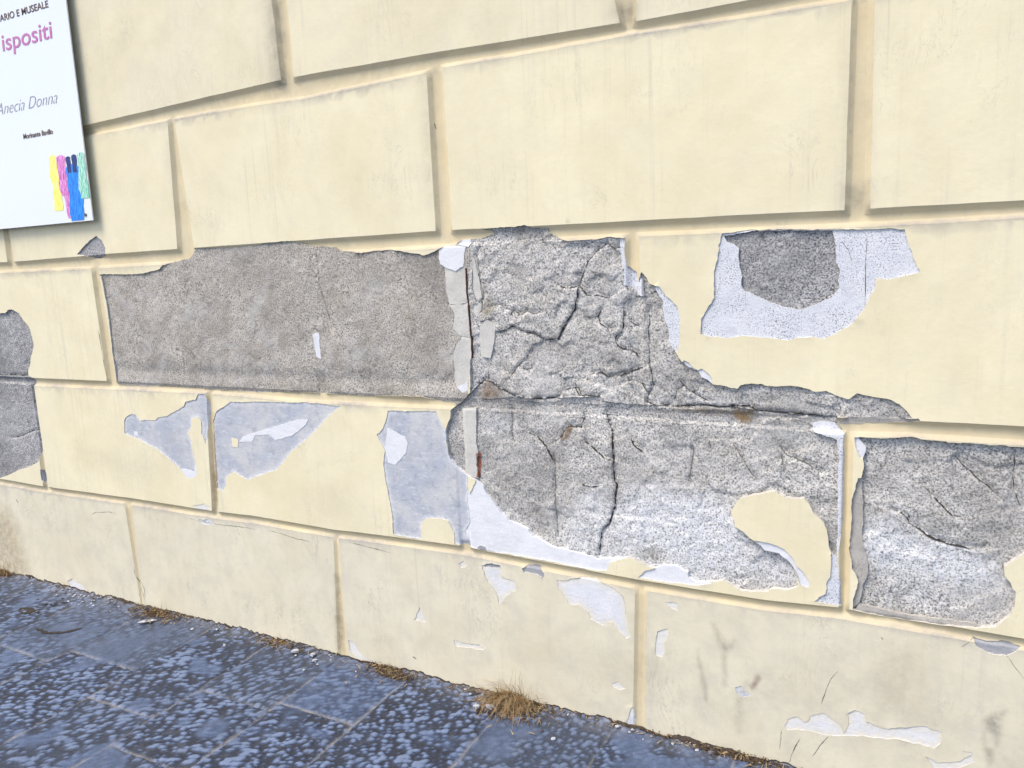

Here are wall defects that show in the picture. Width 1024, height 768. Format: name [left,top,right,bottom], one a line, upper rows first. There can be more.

flaking render [0,310,47,482]
flaking render [100,228,1024,657]
crack [450,243,832,549]
crack [896,510,985,548]
crack [955,456,1020,505]
peeling [785,710,974,768]